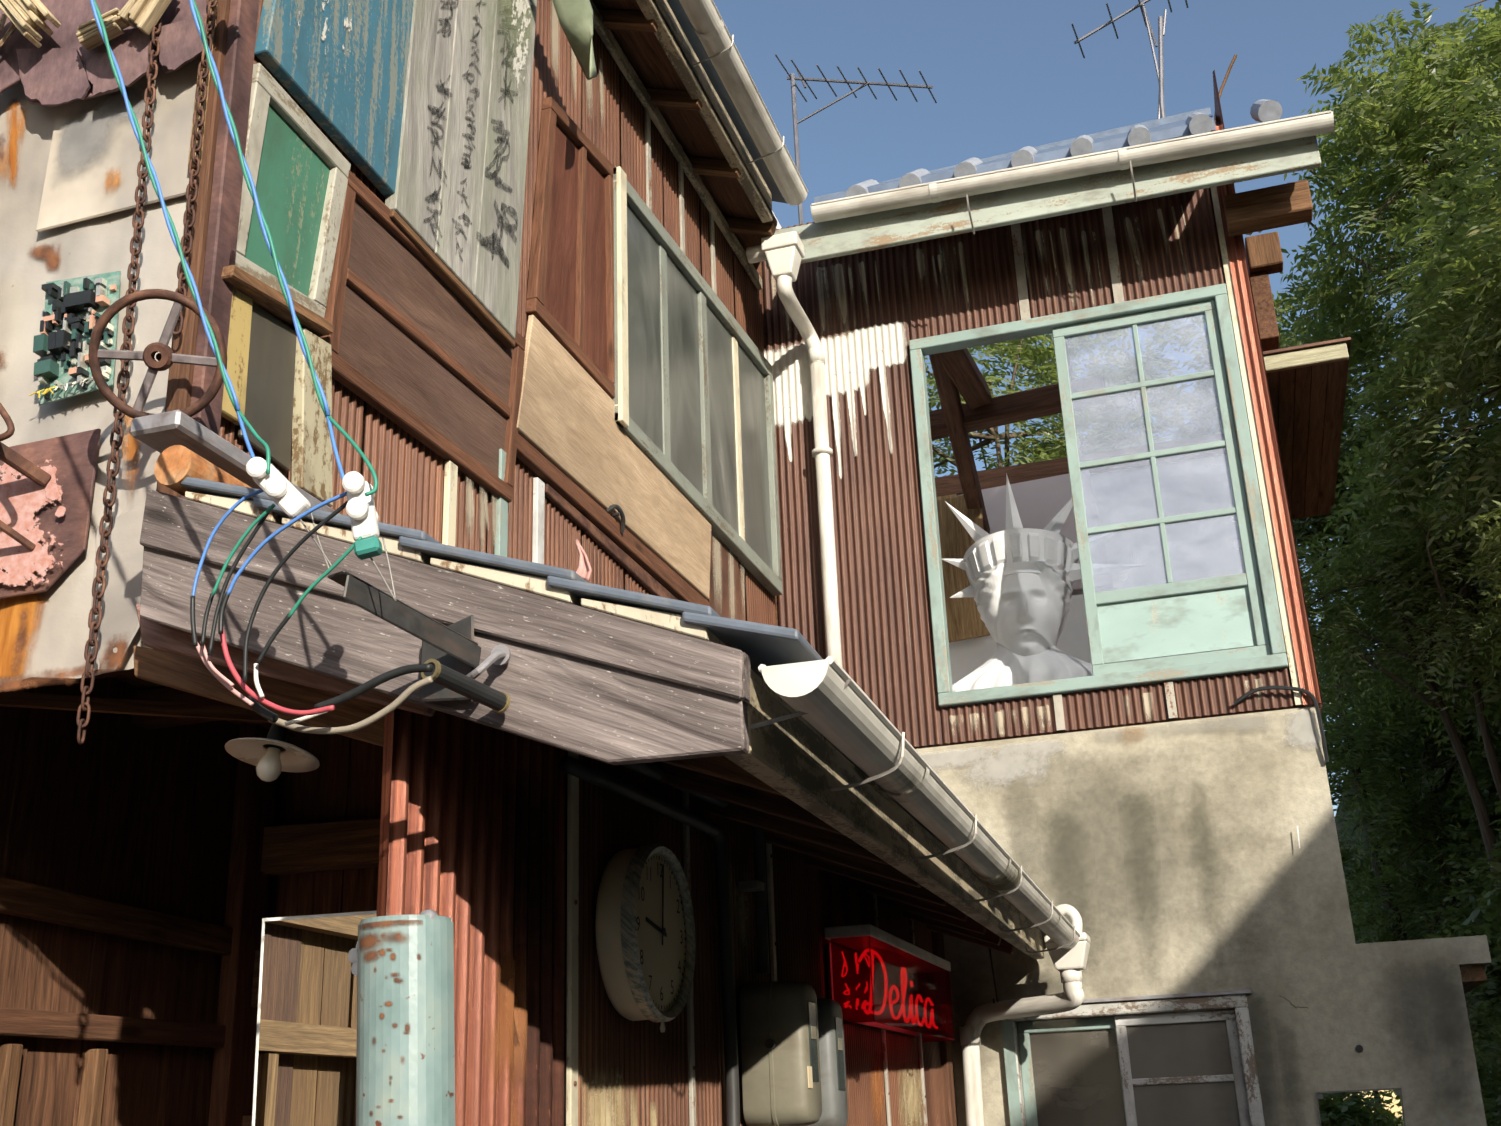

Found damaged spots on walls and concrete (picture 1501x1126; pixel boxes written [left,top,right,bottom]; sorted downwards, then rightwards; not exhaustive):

rust [0,104,24,182]
peeling [0,459,66,587]
rust [0,593,127,691]
rust [359,920,420,982]